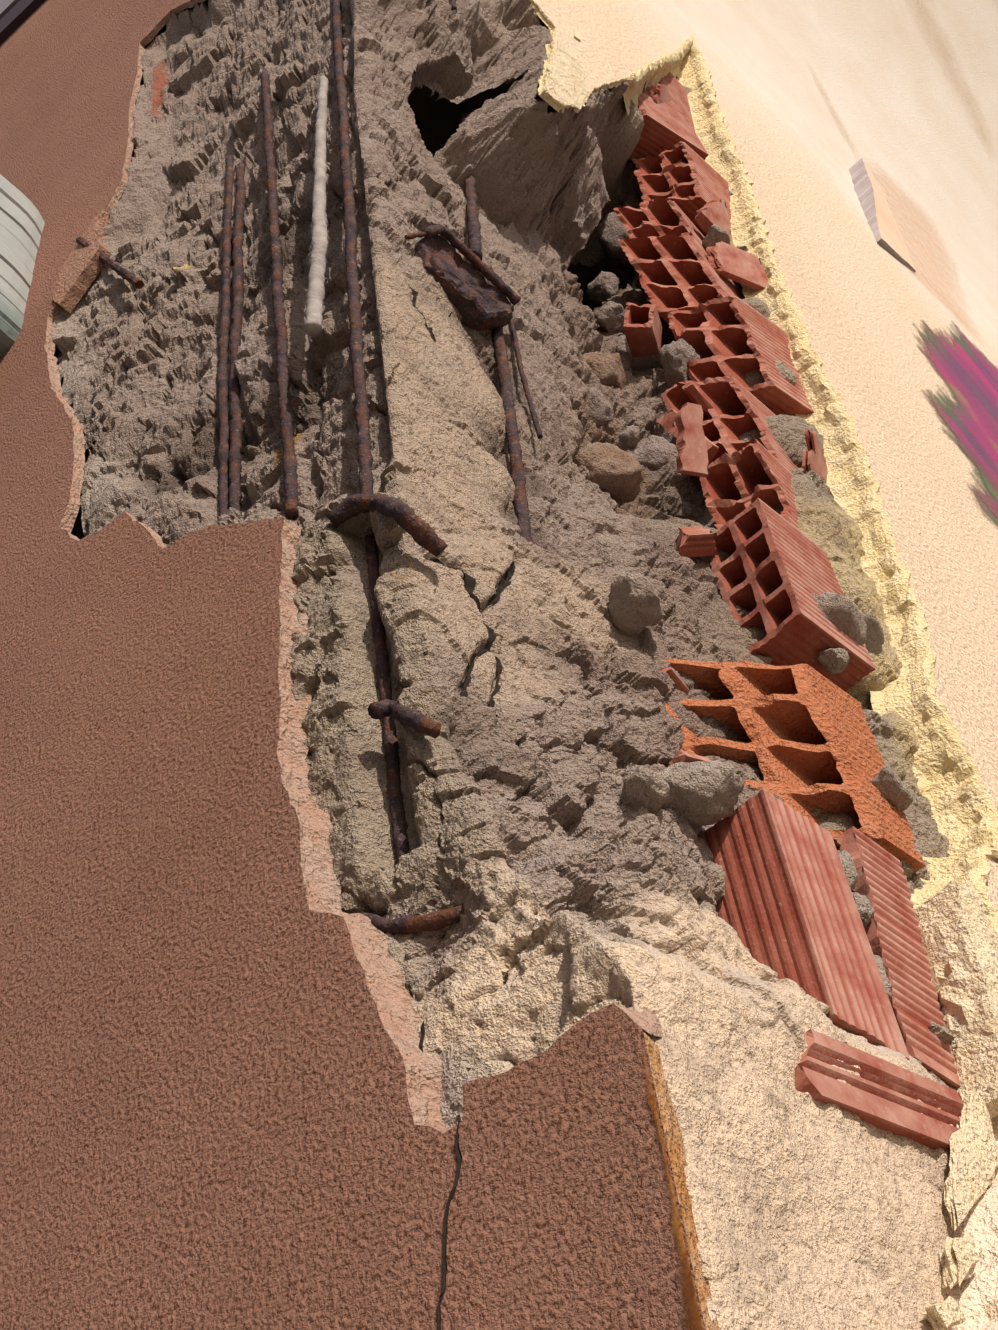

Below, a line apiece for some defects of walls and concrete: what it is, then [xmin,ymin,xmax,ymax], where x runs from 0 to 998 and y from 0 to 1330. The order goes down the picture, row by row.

spalling [44,0,361,549]
crack [429,558,515,724]
spalling [277,0,998,1330]
crack [438,1121,462,1330]